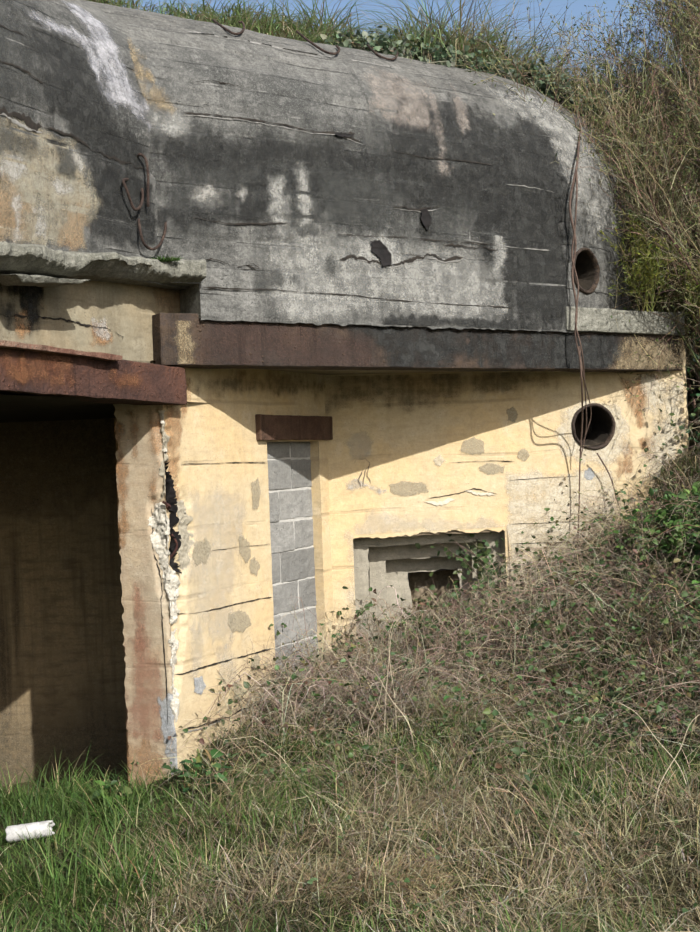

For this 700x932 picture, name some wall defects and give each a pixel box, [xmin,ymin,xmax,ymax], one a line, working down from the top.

water stain [0,0,621,405]
spalling [370,240,392,267]
crack [340,206,499,268]
crack [1,314,123,342]
rust [178,321,194,364]
spalling [148,410,194,723]